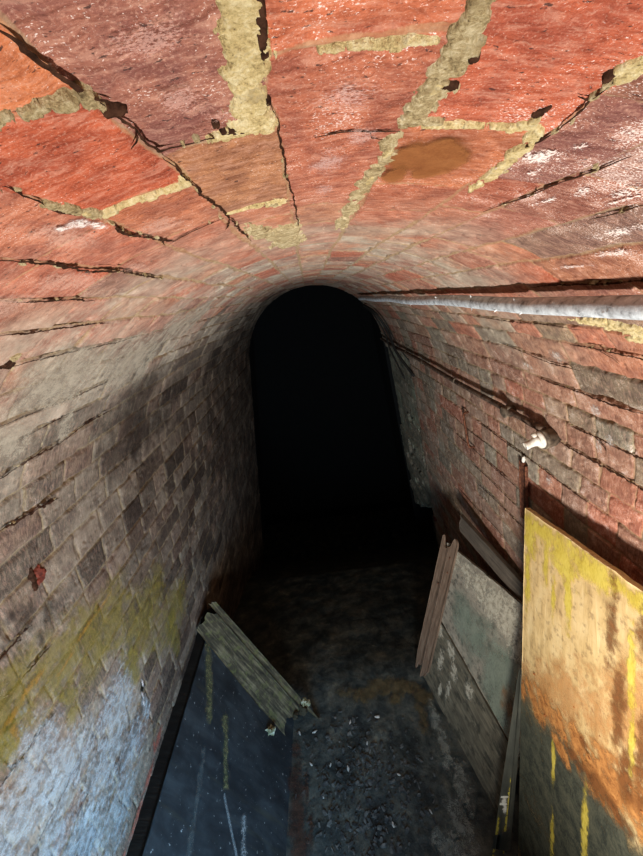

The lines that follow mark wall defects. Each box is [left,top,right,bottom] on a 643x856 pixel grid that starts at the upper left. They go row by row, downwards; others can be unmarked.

spalling [205,0,279,144]
spalling [602,56,643,86]
spalling [0,80,128,131]
spalling [39,174,192,220]
crack [0,30,251,246]
crack [270,97,300,231]
damp [381,139,470,183]
spalling [316,0,552,231]
crack [484,156,631,212]
crack [525,79,614,148]
crack [0,260,163,280]
crack [1,322,142,367]